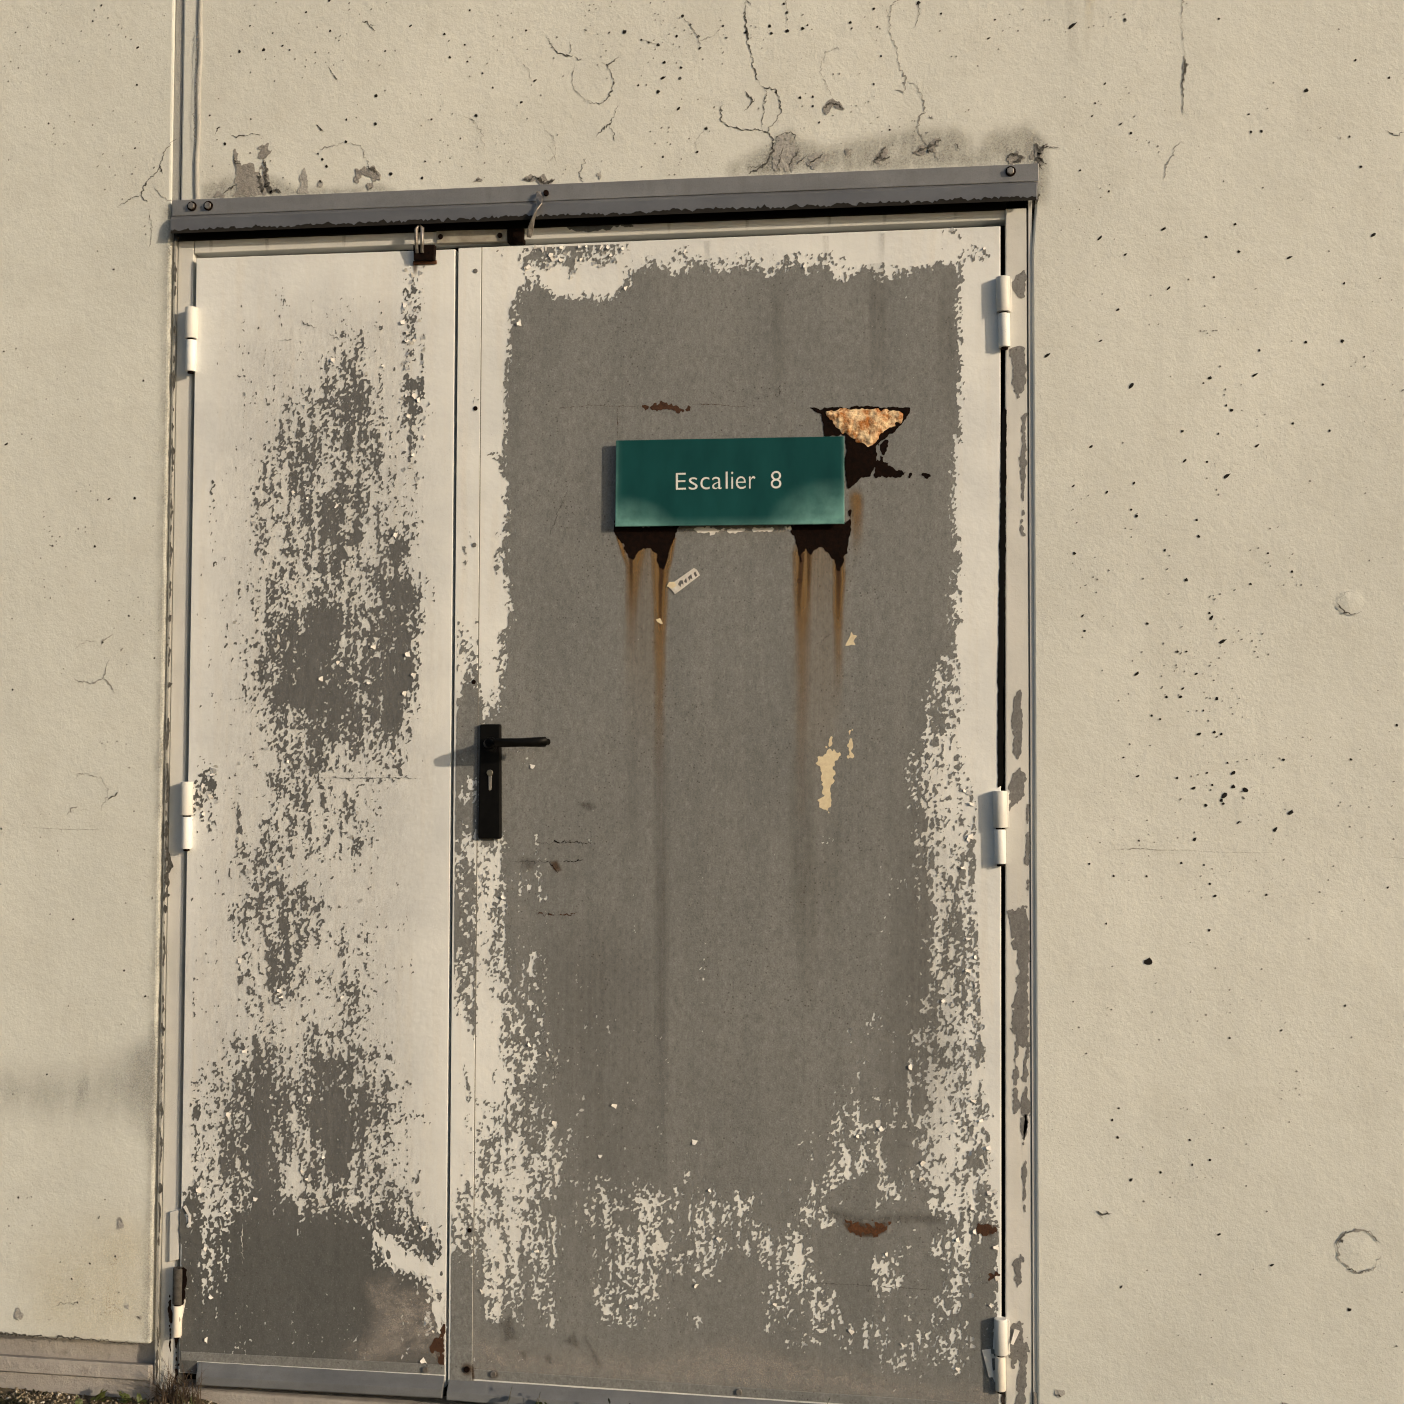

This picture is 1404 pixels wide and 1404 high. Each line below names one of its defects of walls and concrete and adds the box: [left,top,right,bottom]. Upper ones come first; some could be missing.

spalling [212,138,328,198]
crack [516,38,618,182]
crack [684,0,796,174]
crack [886,0,940,160]
crack [1163,0,1189,179]
spalling [101,494,174,688]
rust [613,520,679,681]
rust [776,405,910,644]
spalling [1160,583,1293,844]
peeling [144,224,1065,1404]